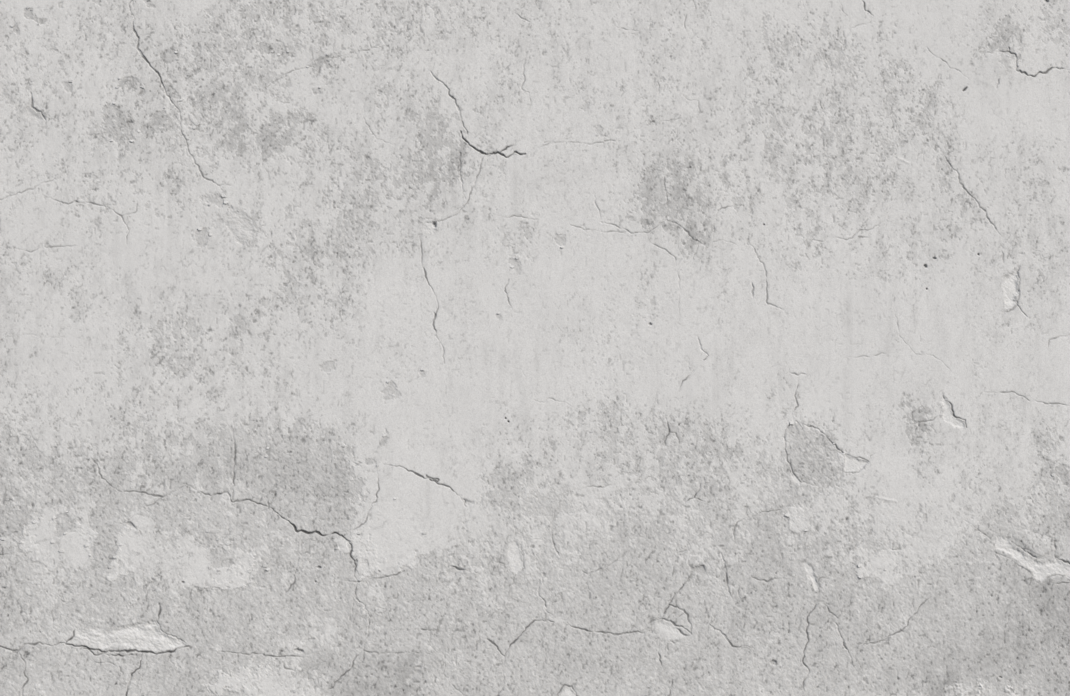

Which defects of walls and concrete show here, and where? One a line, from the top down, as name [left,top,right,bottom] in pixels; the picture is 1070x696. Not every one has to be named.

crack [128,0,232,187]
crack [985,46,1070,90]
crack [418,70,621,365]
crack [570,174,785,446]
crack [840,297,968,429]
crack [942,151,1028,318]
crack [0,602,190,696]
flaking render [67,619,190,654]
crack [90,418,468,696]
crack [475,365,936,696]
crack [963,519,1070,587]
flaking render [991,535,1070,584]